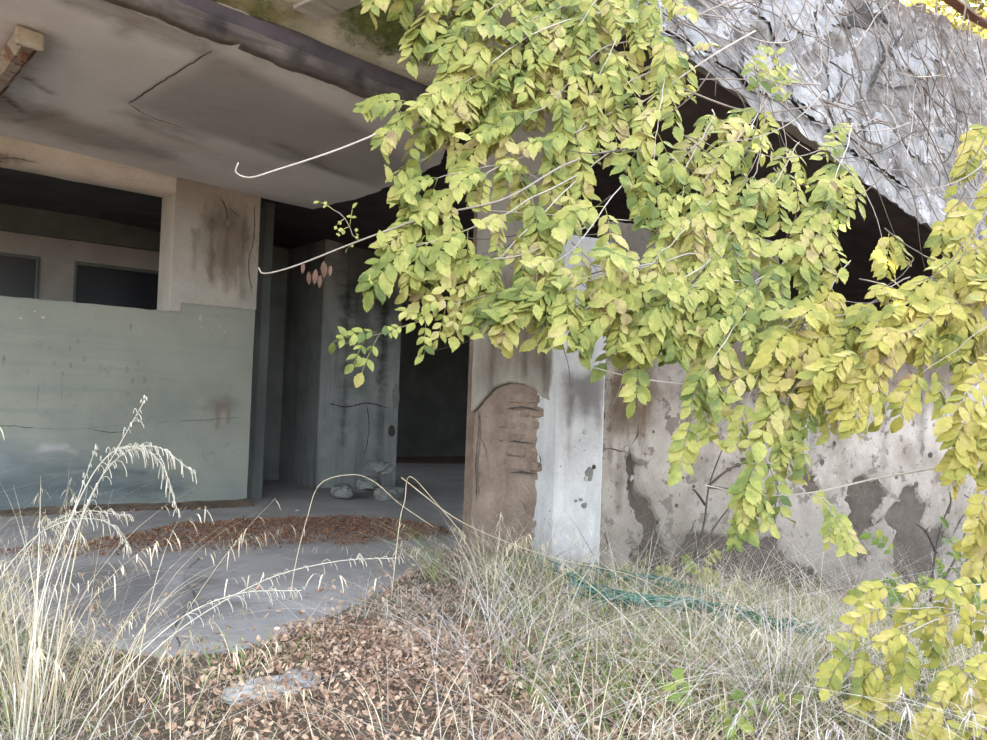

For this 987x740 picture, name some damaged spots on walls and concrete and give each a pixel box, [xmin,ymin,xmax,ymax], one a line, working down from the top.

crack [129,51,212,128]
crack [1,417,237,433]
flaking render [471,376,550,566]
flaking render [841,476,945,587]